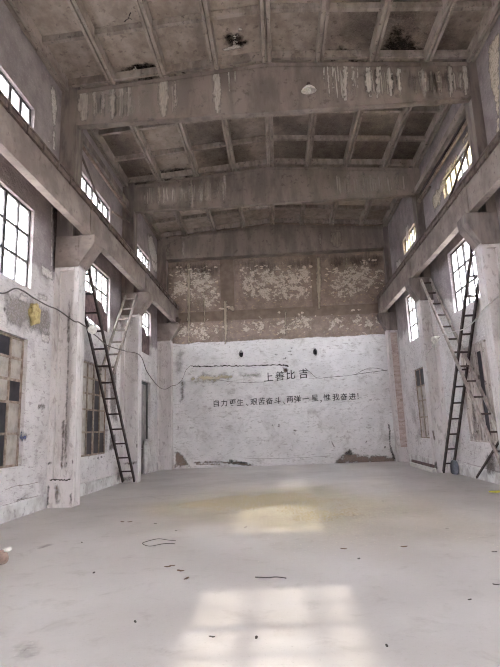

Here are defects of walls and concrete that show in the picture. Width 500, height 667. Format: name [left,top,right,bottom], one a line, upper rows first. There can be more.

peeling [223,28,247,51]
leakage [380,29,420,50]
peeling [488,34,499,132]
peeling [169,266,230,310]
peeling [240,262,313,301]
peeling [324,258,385,299]
peeling [241,312,316,336]
peeling [326,309,380,335]
spalling [174,452,251,468]
spalling [336,424,395,463]